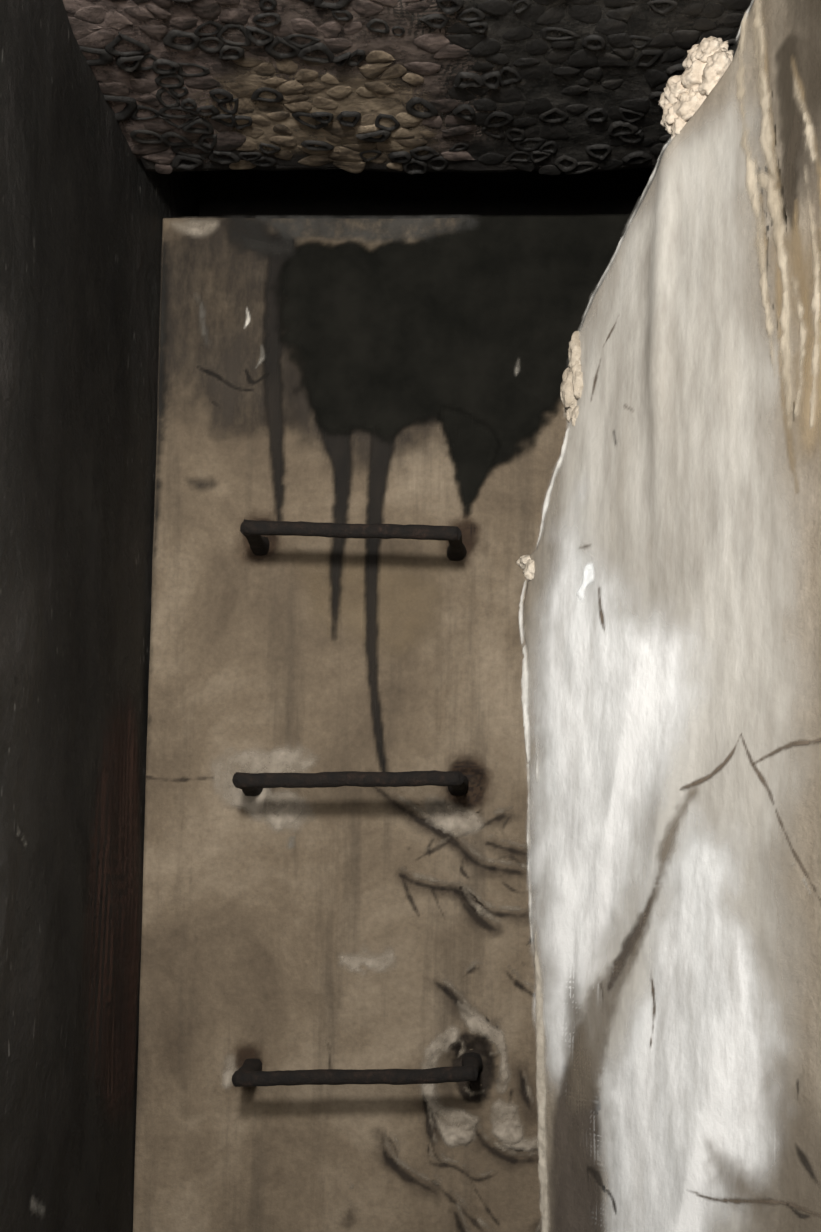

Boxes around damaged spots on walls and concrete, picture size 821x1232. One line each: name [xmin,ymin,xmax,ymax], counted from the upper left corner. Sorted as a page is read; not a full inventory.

leakage [736,14,746,115]
leakage [753,0,773,173]
leakage [777,0,821,227]
leakage [797,207,820,427]
leakage [162,110,792,1232]
flaking render [516,555,538,780]
crack [397,804,532,929]
crack [682,738,821,885]
crack [384,963,532,1232]
spalling [422,862,548,1232]
crack [648,980,656,1045]
leakage [784,1125,821,1232]